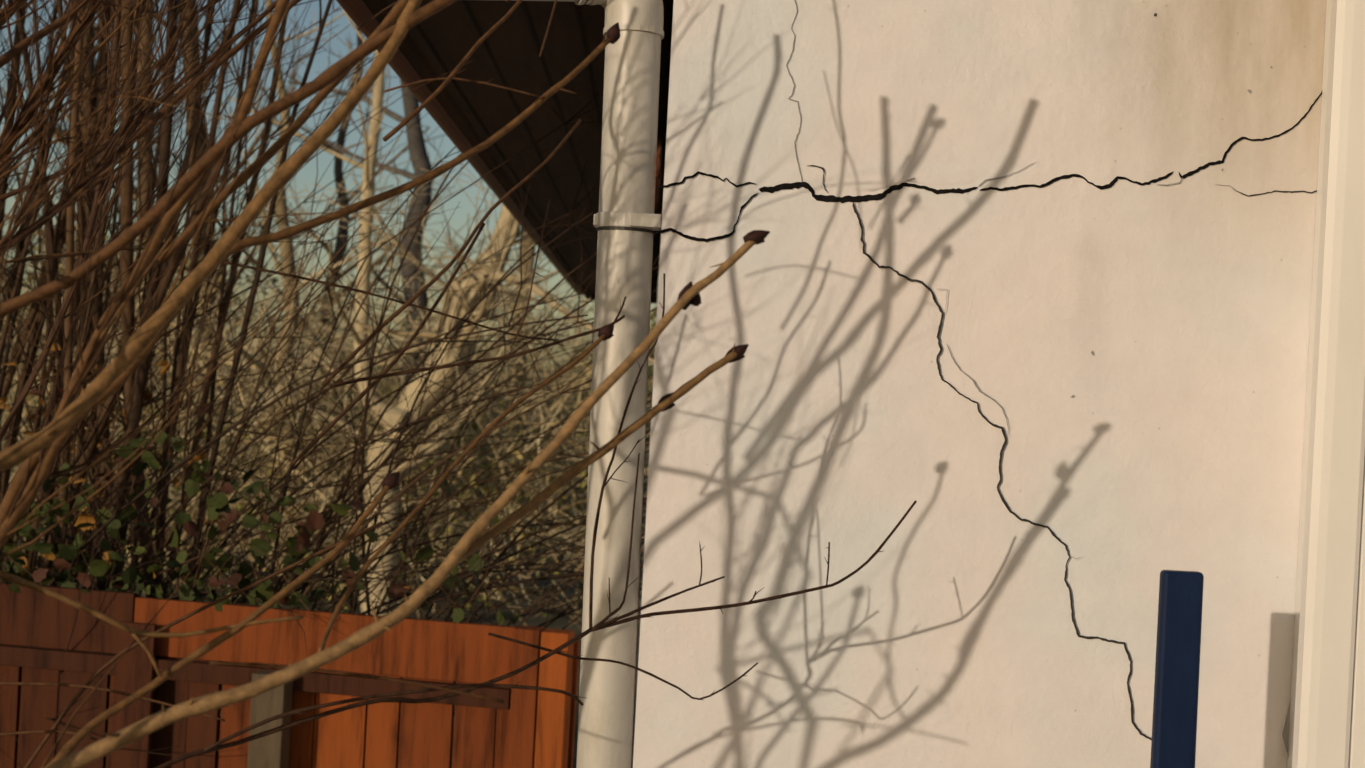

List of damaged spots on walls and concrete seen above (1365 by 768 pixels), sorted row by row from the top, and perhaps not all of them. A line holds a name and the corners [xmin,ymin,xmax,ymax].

crack [651,0,1322,741]